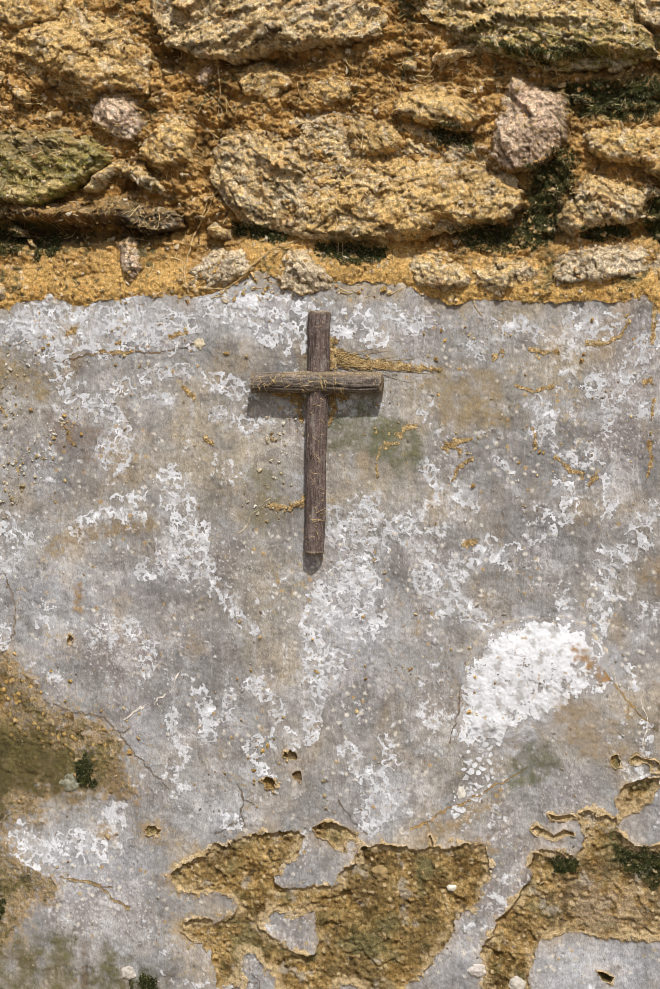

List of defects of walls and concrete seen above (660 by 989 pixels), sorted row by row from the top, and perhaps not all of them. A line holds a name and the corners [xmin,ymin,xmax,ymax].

spalling [163,474,660,989]